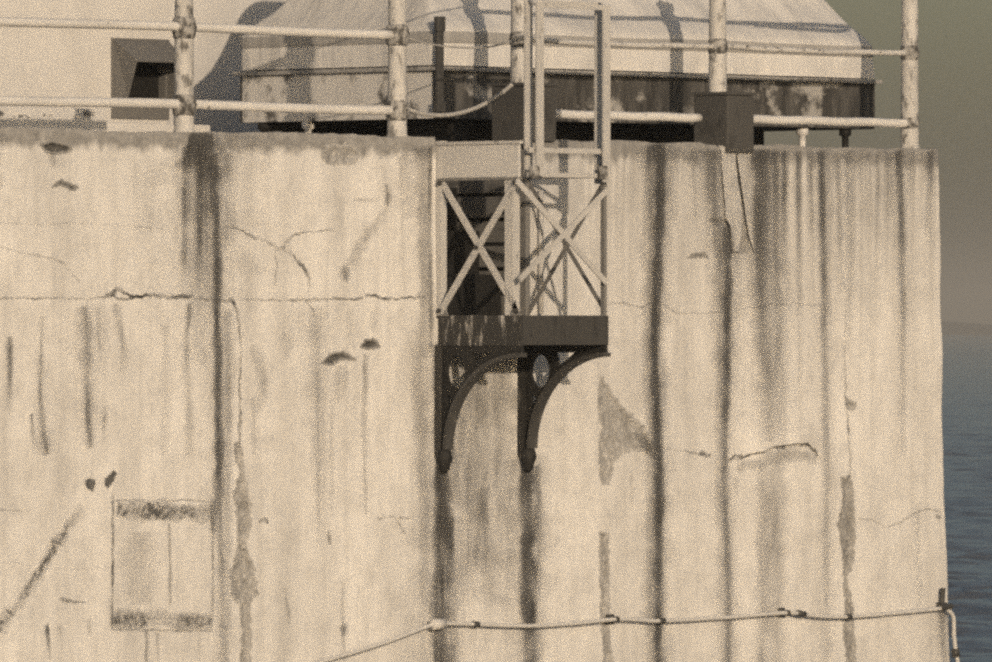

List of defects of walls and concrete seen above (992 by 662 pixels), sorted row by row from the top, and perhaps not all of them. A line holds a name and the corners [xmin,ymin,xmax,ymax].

spalling [40,139,72,155]
spalling [52,179,79,191]
damp [755,150,787,265]
crack [111,290,148,299]
damp [183,132,224,512]
spalling [322,338,381,366]
spalling [598,376,657,485]
damp [649,143,666,662]
damp [722,227,734,469]
spalling [230,442,260,662]
spalling [599,530,614,662]
spalling [837,474,857,662]